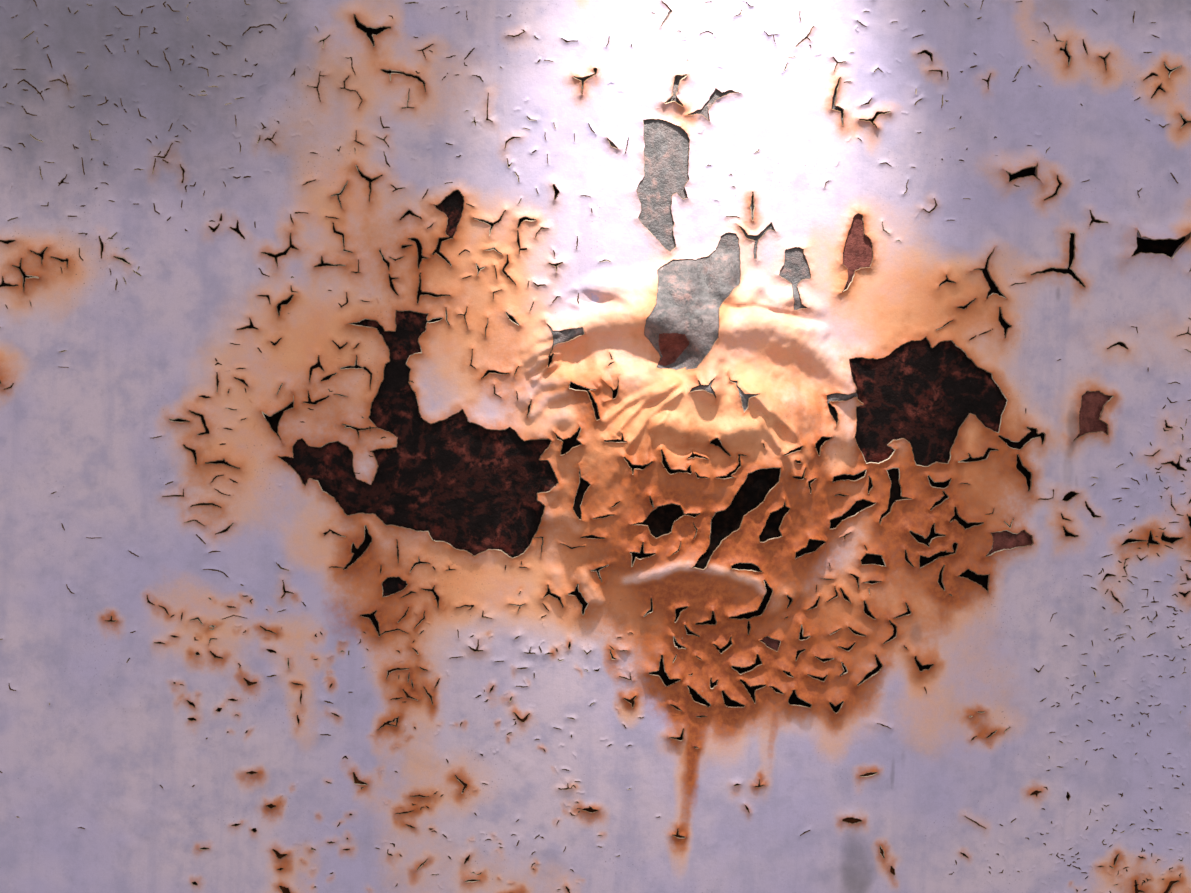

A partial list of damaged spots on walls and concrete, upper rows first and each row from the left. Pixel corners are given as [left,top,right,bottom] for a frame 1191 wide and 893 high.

crack [641,0,708,117]
crack [139,0,626,586]
peeling [242,295,631,584]
peeling [616,70,889,425]
peeling [612,137,1132,615]
crack [919,157,1191,365]
peeling [1097,201,1191,289]
crack [205,406,1191,836]
corrosion [924,570,1018,634]
corrosion [371,710,450,768]
corrosion [663,719,781,828]
corrosion [805,690,889,774]